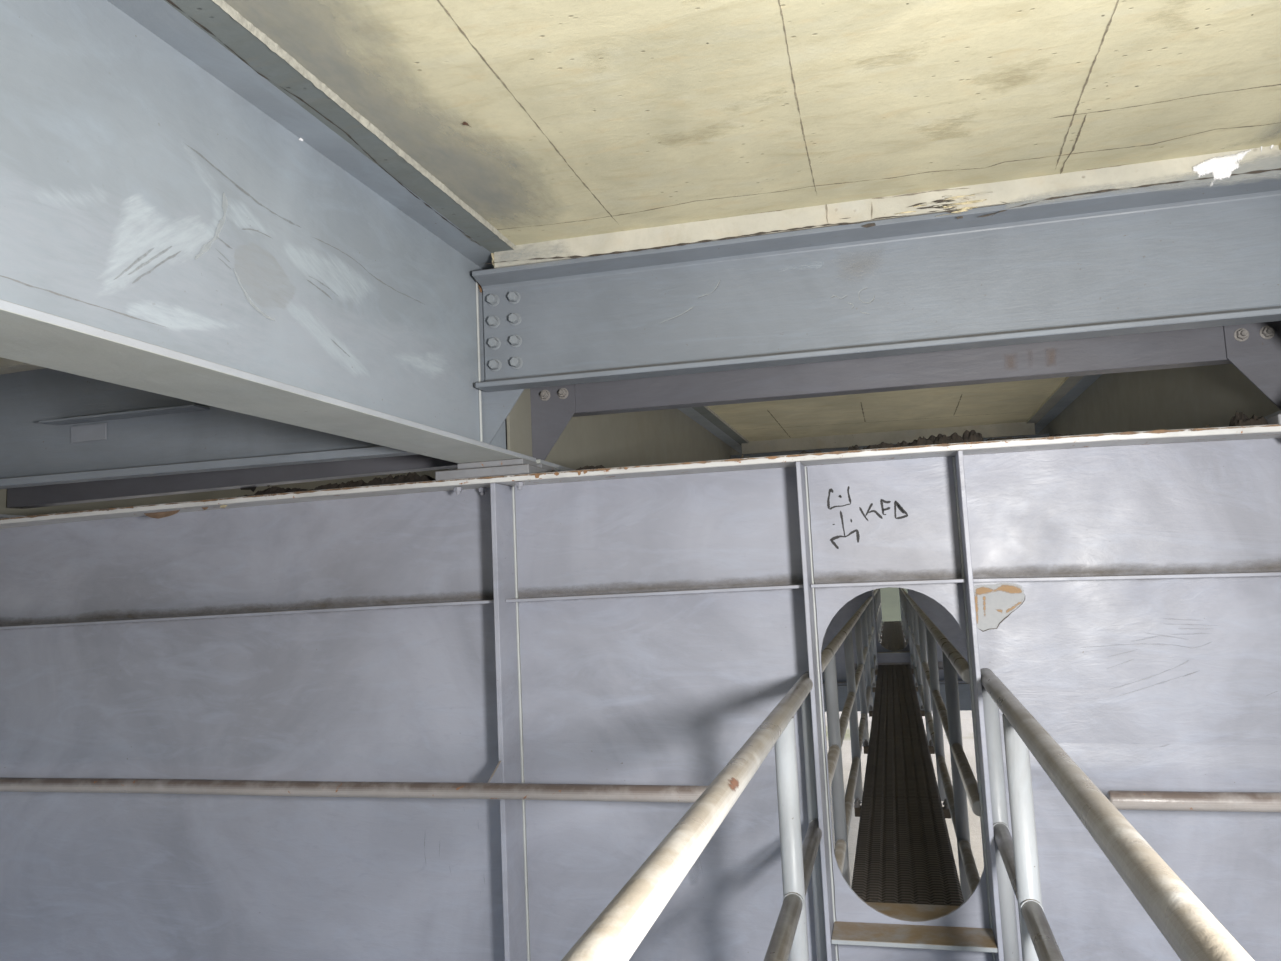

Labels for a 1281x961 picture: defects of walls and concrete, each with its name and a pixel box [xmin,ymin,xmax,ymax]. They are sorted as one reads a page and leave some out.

crack [167,0,968,265]
crack [1012,164,1281,208]
peeling [974,583,1025,632]